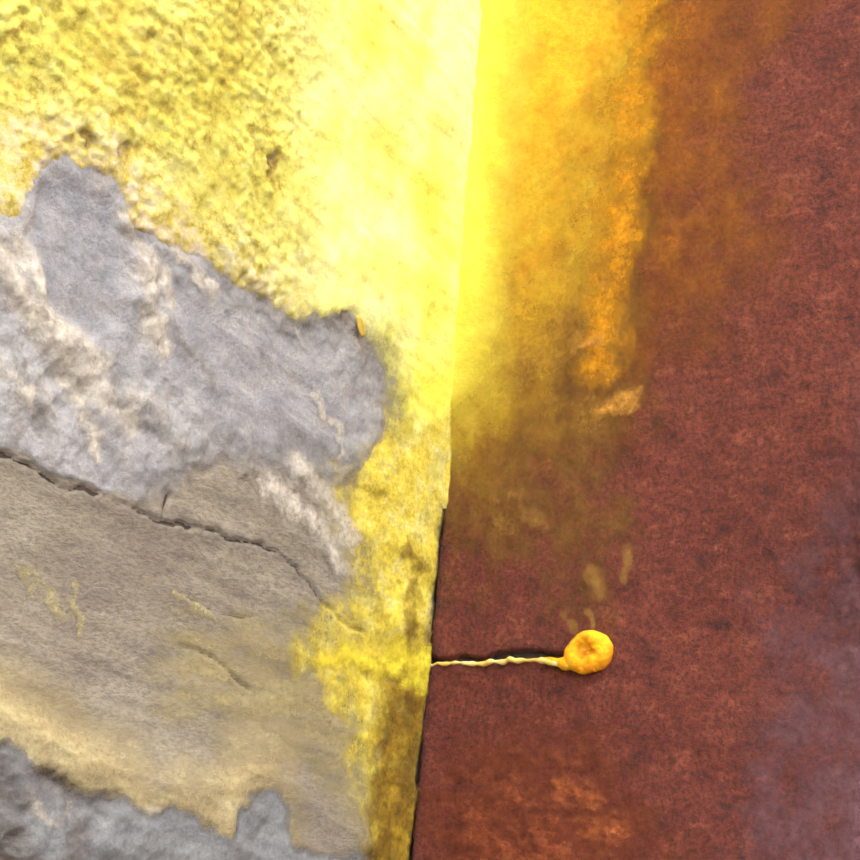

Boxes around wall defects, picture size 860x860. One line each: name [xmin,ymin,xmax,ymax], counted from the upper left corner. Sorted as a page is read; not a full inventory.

spalling [0,155,393,571]
corrosion [596,389,639,416]
crack [0,451,328,609]
crack [427,506,568,667]
peeling [0,738,372,860]
crack [408,687,427,860]